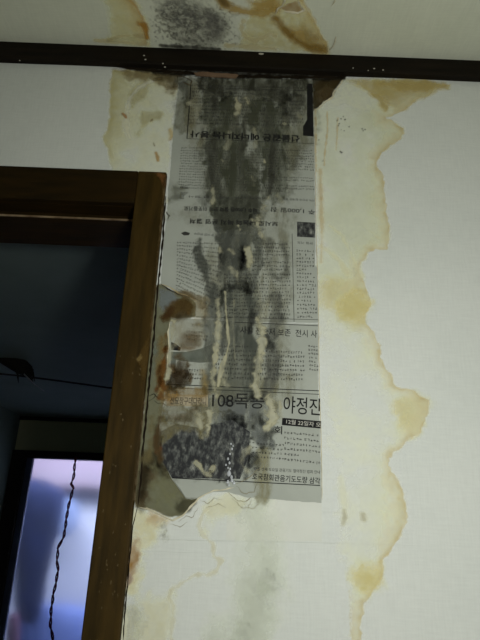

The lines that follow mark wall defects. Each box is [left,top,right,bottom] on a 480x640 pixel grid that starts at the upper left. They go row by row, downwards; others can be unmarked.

leakage [96,0,148,44]
leakage [160,0,326,52]
corrosion [146,333,209,462]
corrosion [162,291,198,321]
peeling [135,284,231,521]
leakage [103,69,314,502]
leakage [315,79,449,640]